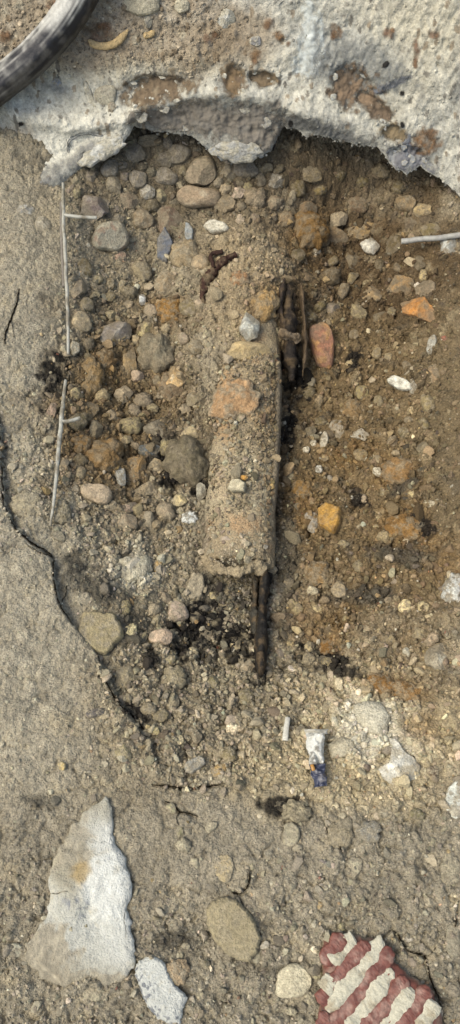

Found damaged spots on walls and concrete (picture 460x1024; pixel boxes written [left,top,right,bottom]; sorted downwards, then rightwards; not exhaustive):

rust [413,129,442,155]
crack [0,437,74,625]
crack [97,655,144,733]